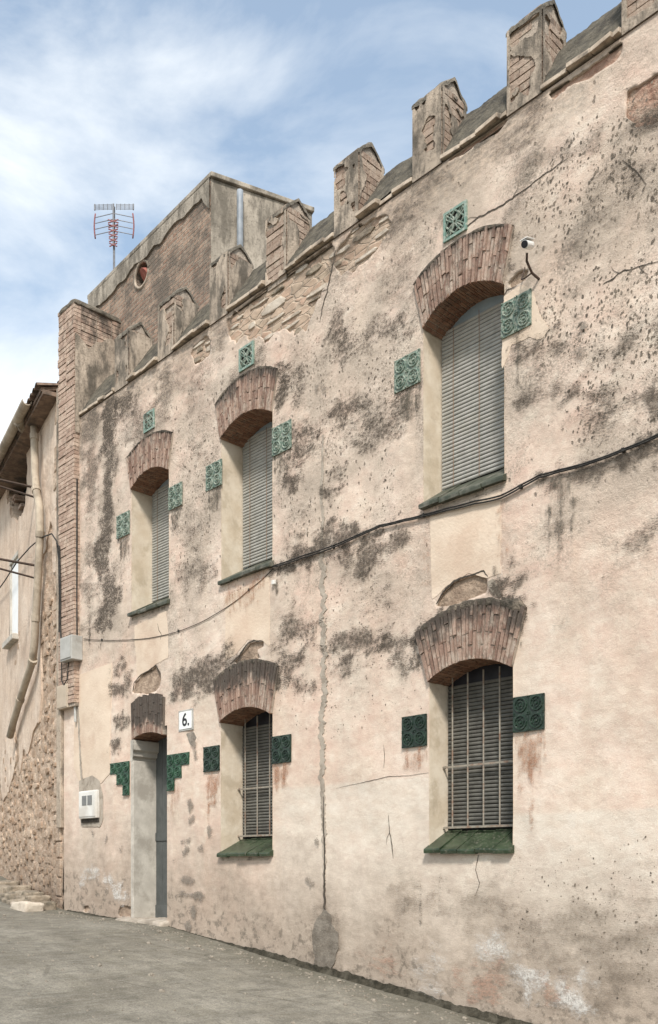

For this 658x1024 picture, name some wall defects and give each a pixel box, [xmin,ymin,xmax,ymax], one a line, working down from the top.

flaking render [626,75,658,127]
crack [467,159,566,226]
flaking render [228,215,392,343]
crack [604,261,658,284]
flaking render [438,576,487,607]
flaking render [134,667,161,694]
crack [312,434,424,969]
water stain [513,908,658,1014]